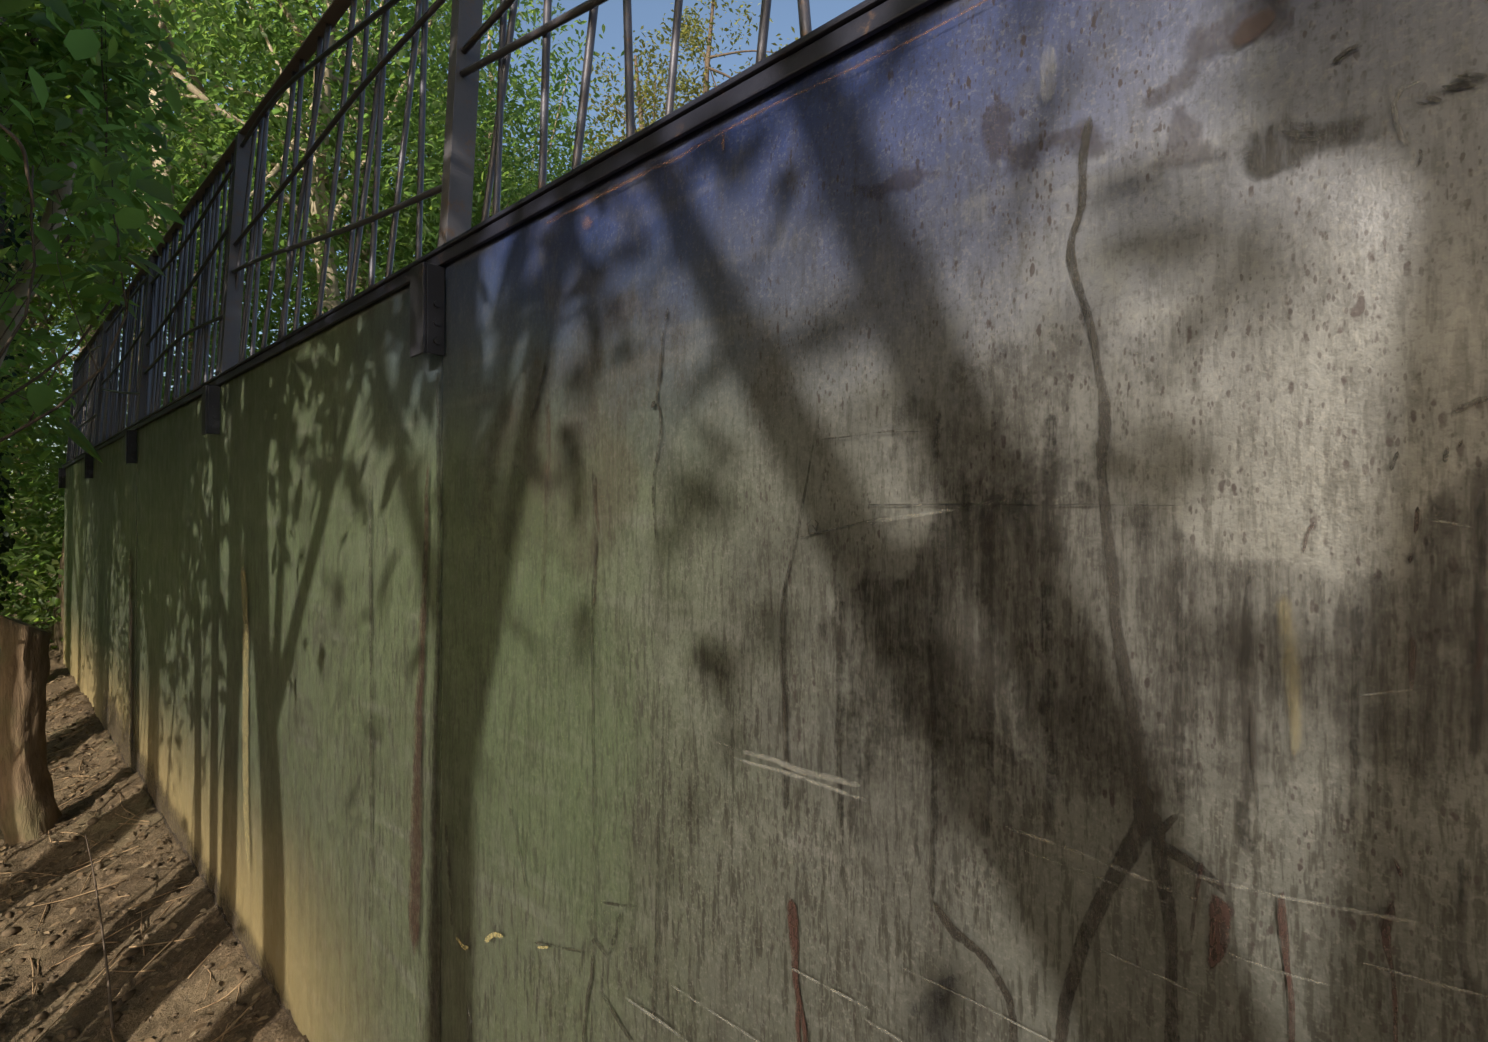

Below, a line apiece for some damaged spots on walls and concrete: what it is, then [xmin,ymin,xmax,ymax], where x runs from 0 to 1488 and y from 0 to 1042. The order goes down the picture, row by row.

corrosion [409,469,428,947]
crack [779,436,1093,777]
water stain [833,117,1488,1042]
corrosion [787,899,808,1042]
corrosion [1190,864,1231,969]